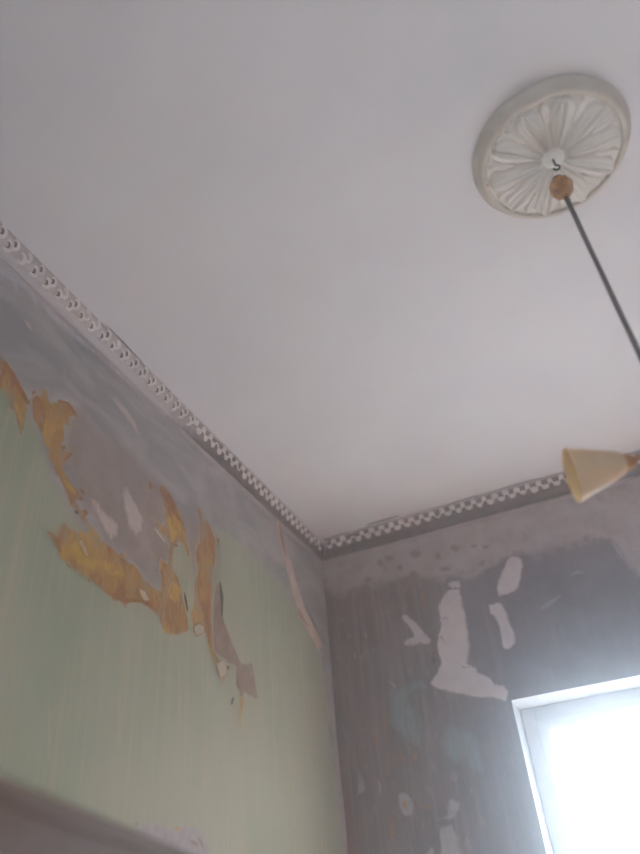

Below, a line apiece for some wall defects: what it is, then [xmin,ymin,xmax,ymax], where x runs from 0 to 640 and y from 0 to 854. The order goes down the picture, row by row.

peeling [0,357,258,727]